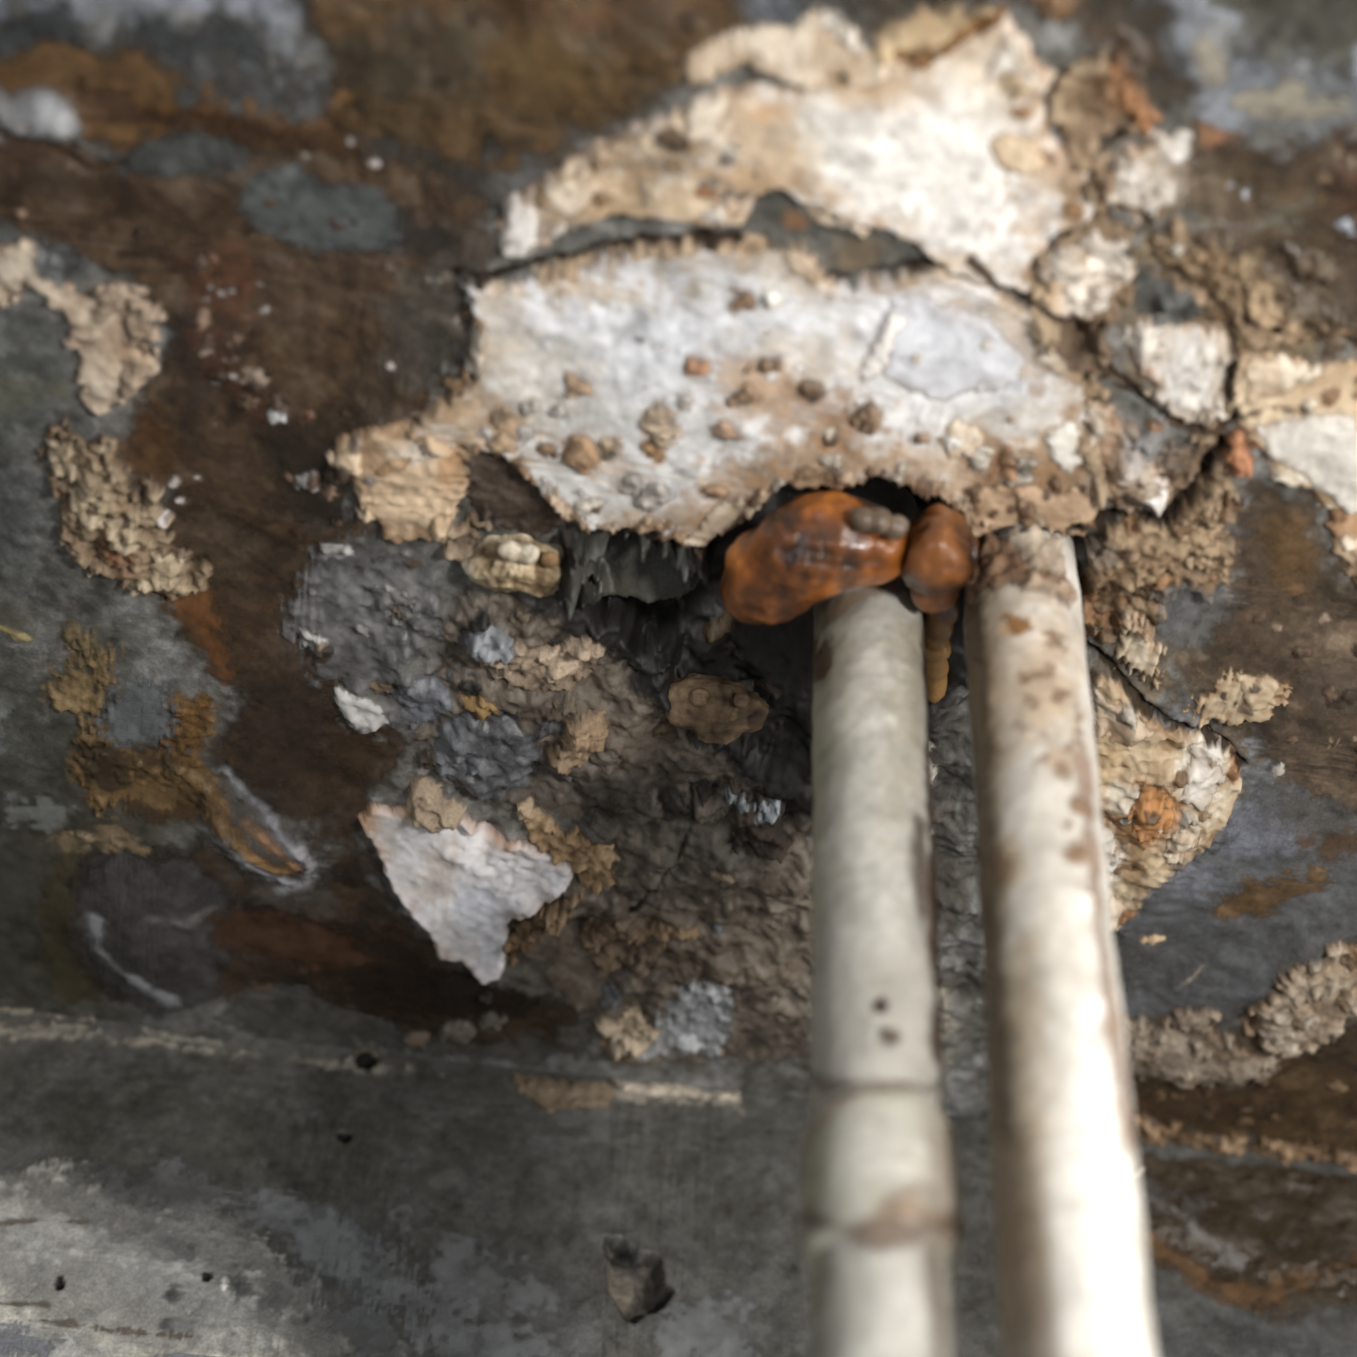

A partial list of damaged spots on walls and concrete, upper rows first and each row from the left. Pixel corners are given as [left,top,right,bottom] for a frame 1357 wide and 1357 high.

crack [450,227,745,291]
peeling [91,288,160,400]
water stain [268,401,286,424]
crack [882,169,1357,563]
peeling [45,437,188,597]
water stain [157,476,200,528]
flaking render [326,0,1357,1067]
water stain [282,543,441,742]
water stain [465,625,515,666]
rust [813,640,831,681]
rust [913,644,943,1062]
flaking render [1123,940,1357,1090]